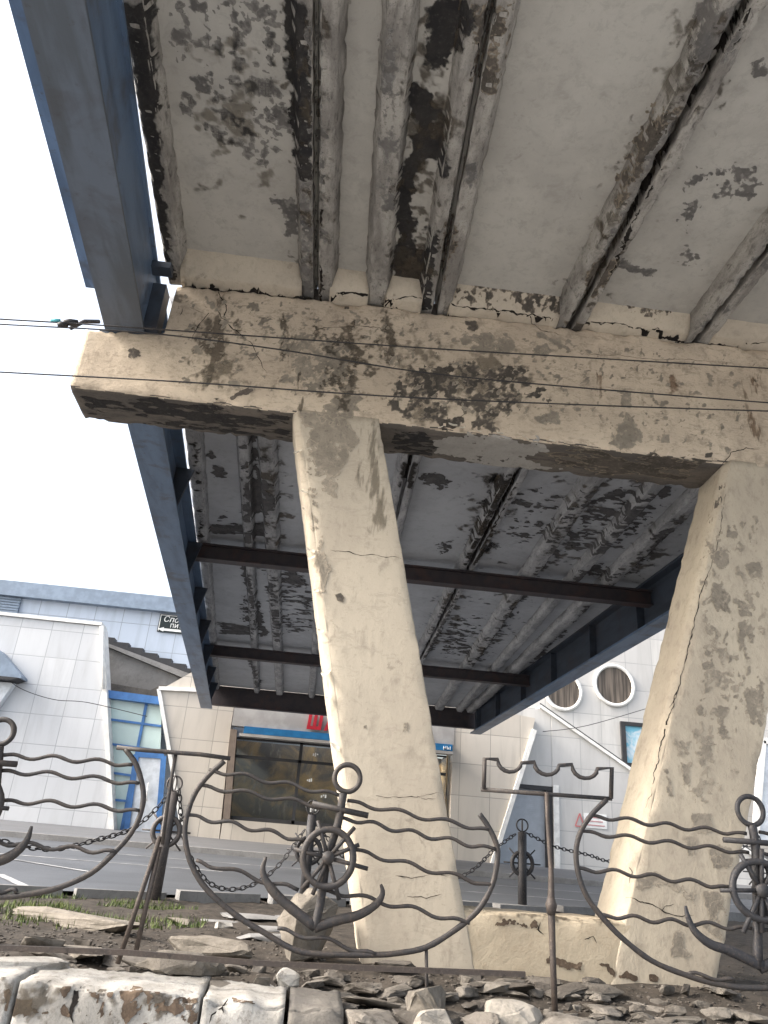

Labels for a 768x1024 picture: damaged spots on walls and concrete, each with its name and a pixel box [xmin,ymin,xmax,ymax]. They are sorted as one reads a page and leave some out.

peeling [169,0,295,168]
peeling [304,12,327,80]
crack [686,0,751,108]
crack [609,137,669,279]
peeling [178,91,763,642]
crack [448,303,766,348]
crack [646,494,726,806]